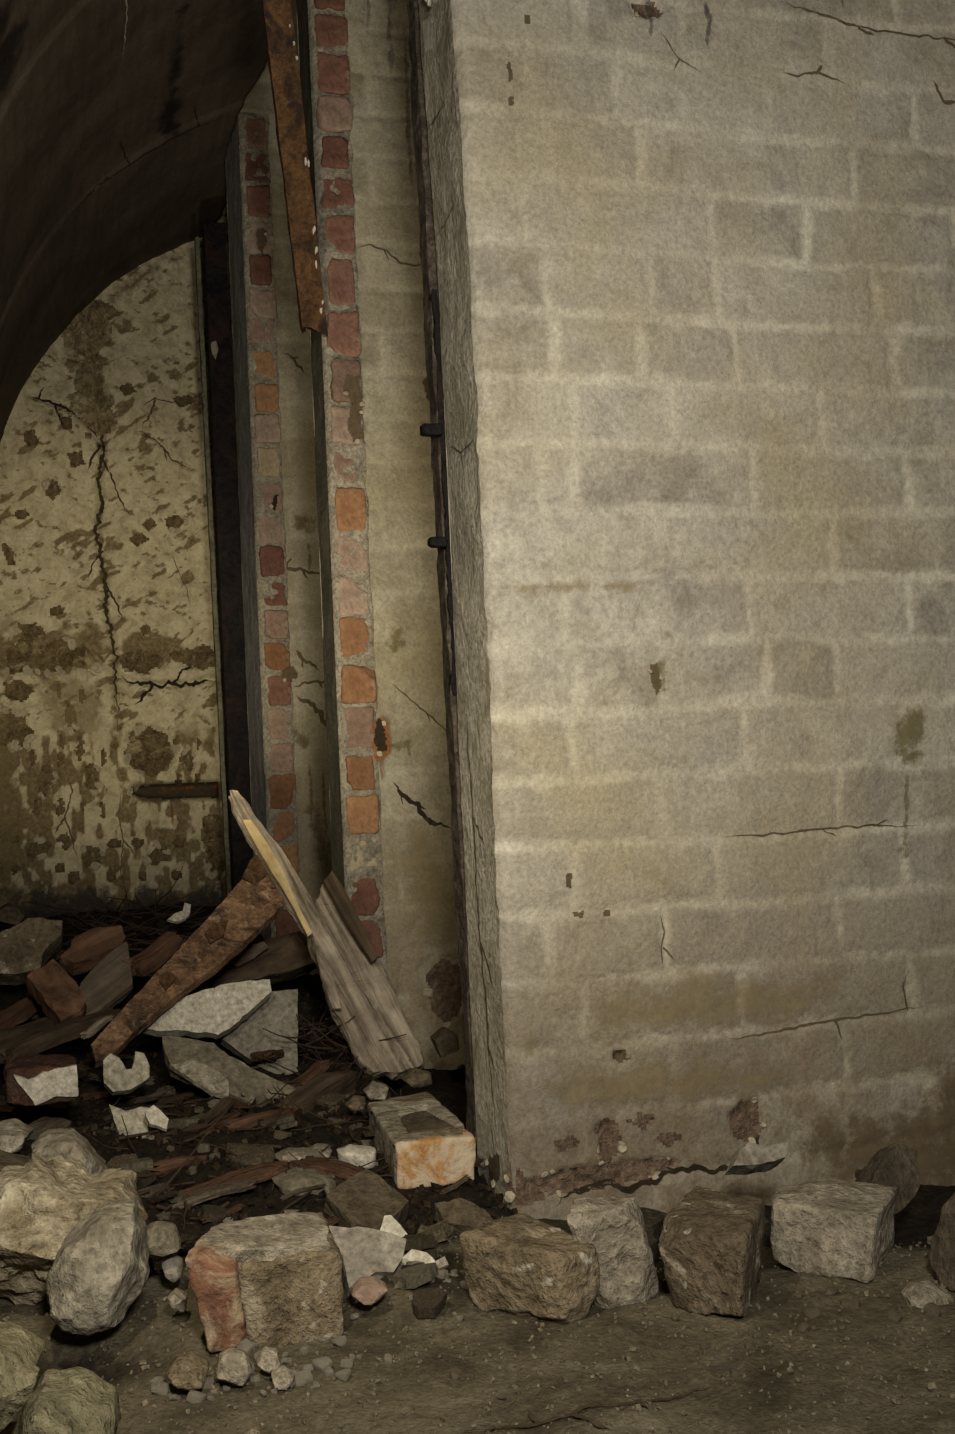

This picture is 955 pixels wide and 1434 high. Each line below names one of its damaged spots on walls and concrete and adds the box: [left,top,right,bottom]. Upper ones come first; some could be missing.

crack [784,2,955,48]
crack [782,65,843,83]
spalling [41,450,86,501]
spalling [2,544,16,565]
crack [27,388,214,740]
spalling [129,515,189,547]
spalling [0,605,231,885]
crack [725,819,915,837]
crack [390,682,496,1136]
crack [730,971,922,1040]
spalling [729,1097,767,1144]
spalling [484,1112,682,1205]